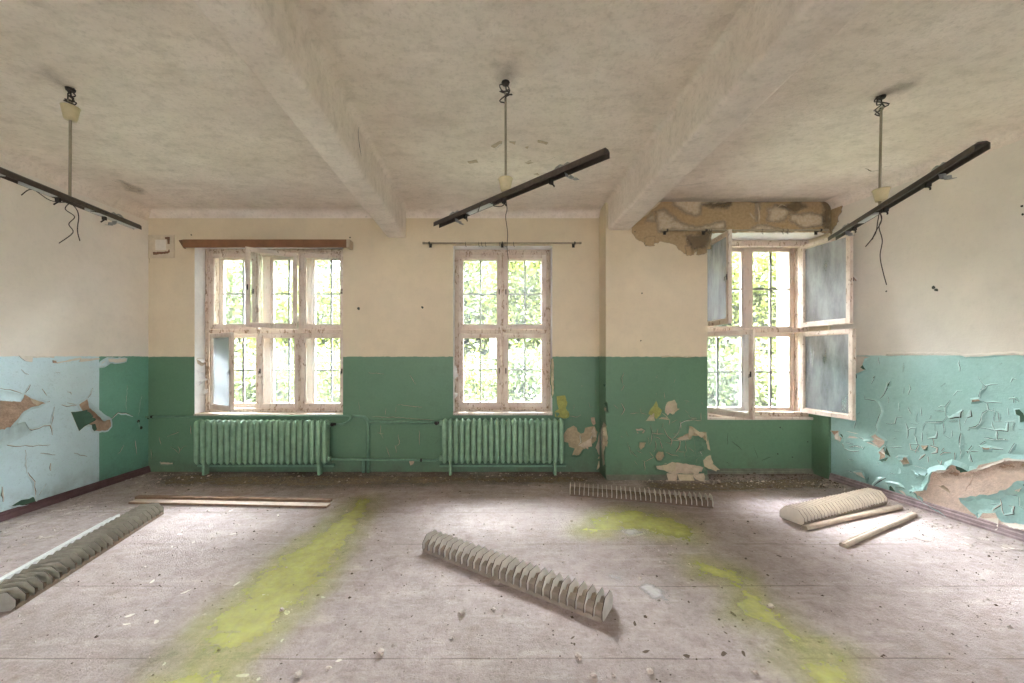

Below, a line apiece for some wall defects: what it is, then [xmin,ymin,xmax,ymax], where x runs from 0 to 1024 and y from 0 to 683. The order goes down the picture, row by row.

peeling [19,356,128,368]
peeling [844,354,891,388]
peeling [0,384,149,448]
peeling [550,358,609,469]
peeling [635,398,719,481]
peeling [1013,408,1024,423]
peeling [9,495,38,508]
flaking render [831,429,1024,531]